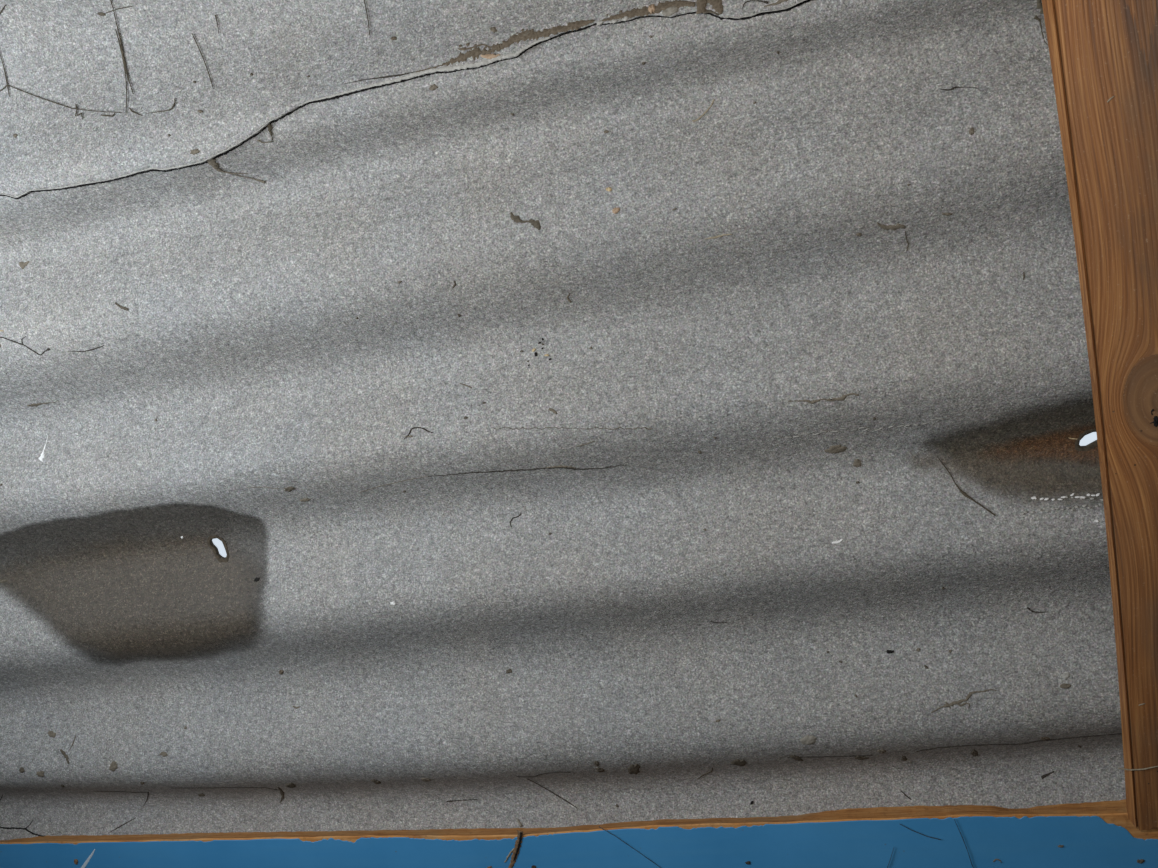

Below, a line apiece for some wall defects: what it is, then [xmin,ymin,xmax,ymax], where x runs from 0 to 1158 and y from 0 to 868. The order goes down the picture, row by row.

crack [0,0,813,199]
damp [0,504,266,663]